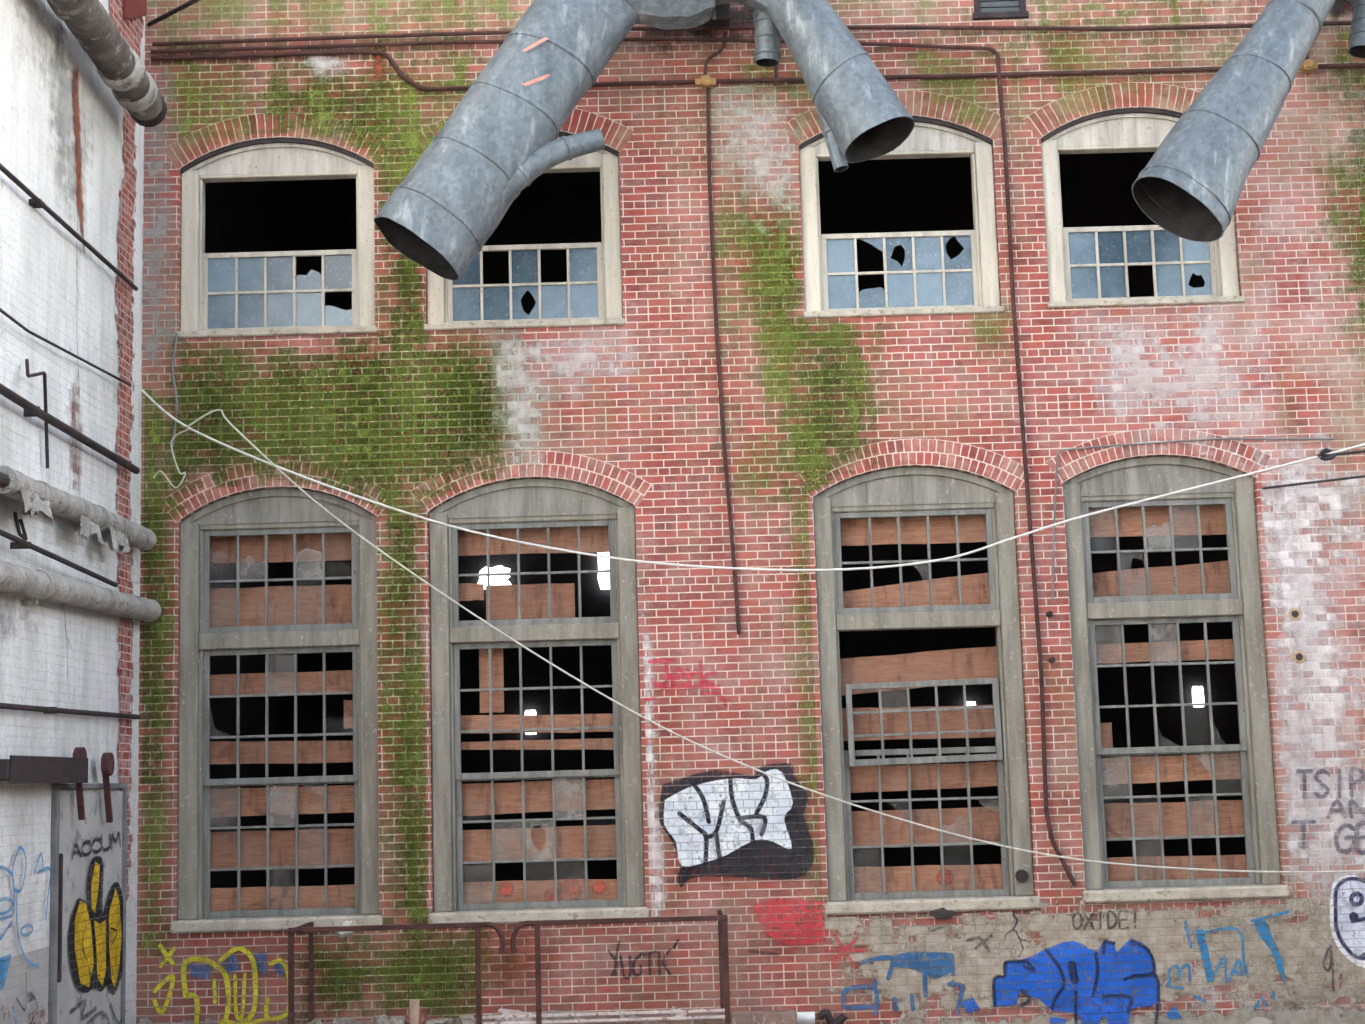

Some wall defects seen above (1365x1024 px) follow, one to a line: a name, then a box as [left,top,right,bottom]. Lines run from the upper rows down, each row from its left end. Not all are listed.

leakage [1262,464,1365,891]